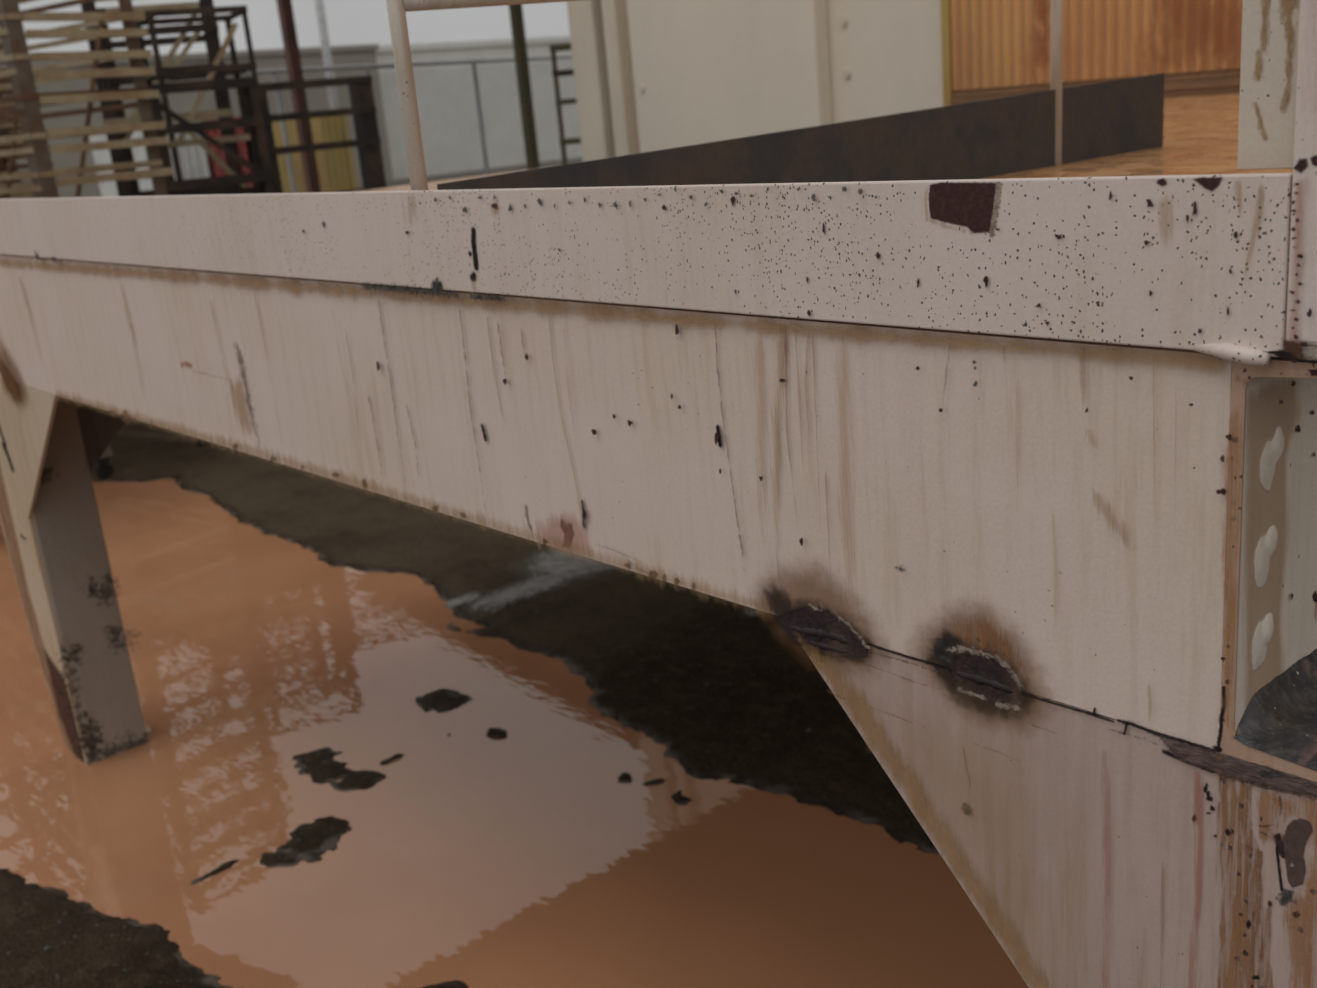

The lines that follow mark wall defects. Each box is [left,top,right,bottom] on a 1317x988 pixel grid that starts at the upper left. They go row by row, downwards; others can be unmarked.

rust [1255,0,1296,109]
rust [1160,738,1317,988]